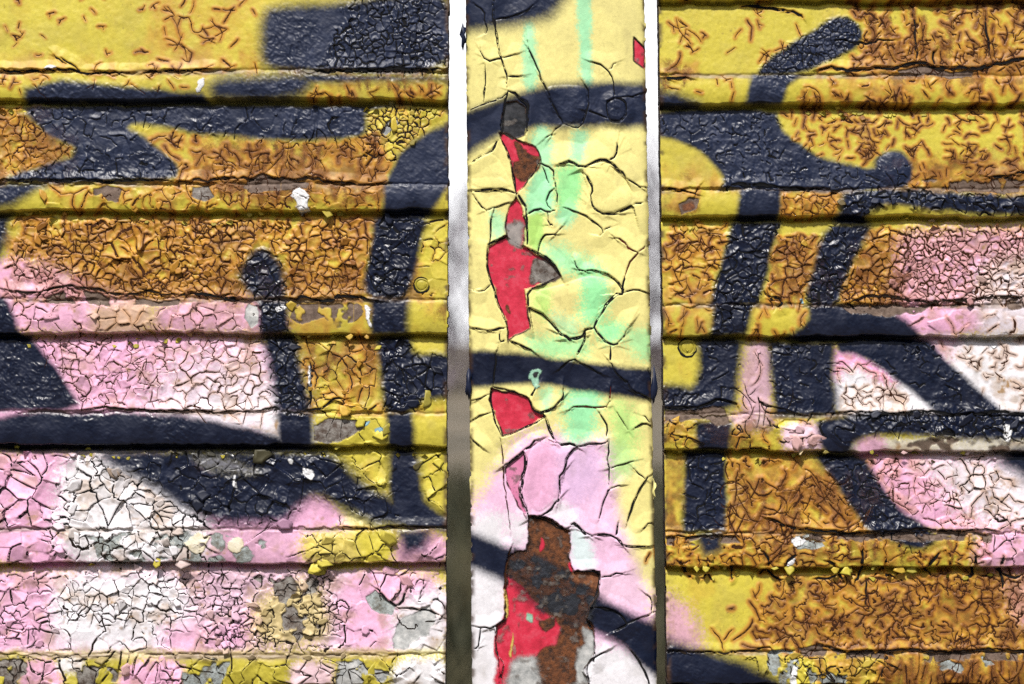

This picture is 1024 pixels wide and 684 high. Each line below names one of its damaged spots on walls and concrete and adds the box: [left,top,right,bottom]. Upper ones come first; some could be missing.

peeling [486,100,562,342]
crack [0,0,447,684]
crack [471,0,1024,684]
peeling [87,531,266,569]
peeling [253,559,333,642]
peeling [77,665,118,684]
peeling [181,662,230,684]
peeling [336,659,389,684]